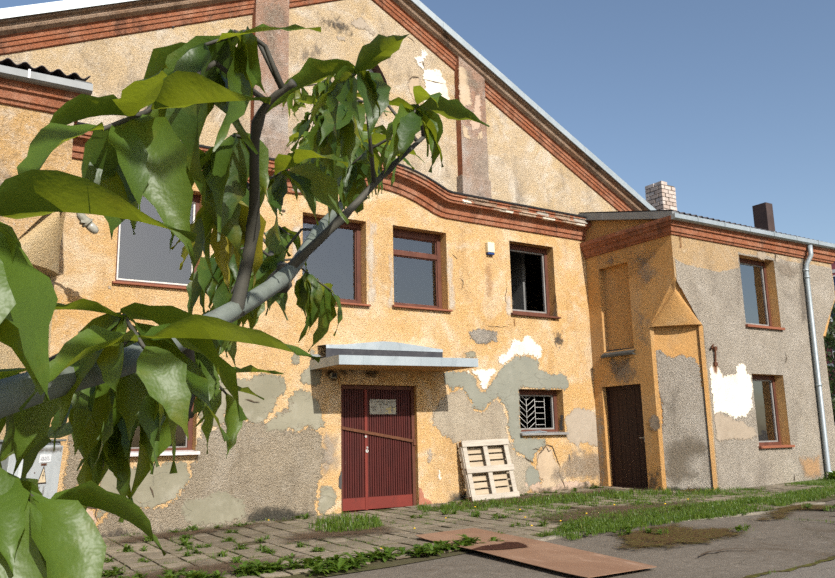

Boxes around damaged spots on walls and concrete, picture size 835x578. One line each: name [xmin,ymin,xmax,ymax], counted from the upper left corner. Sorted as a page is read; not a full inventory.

peeling [408,49,483,139]
peeling [466,335,543,390]
flaking render [649,252,835,491]
flaking render [62,434,83,490]
flaking render [86,420,337,537]
flaking render [432,388,604,494]